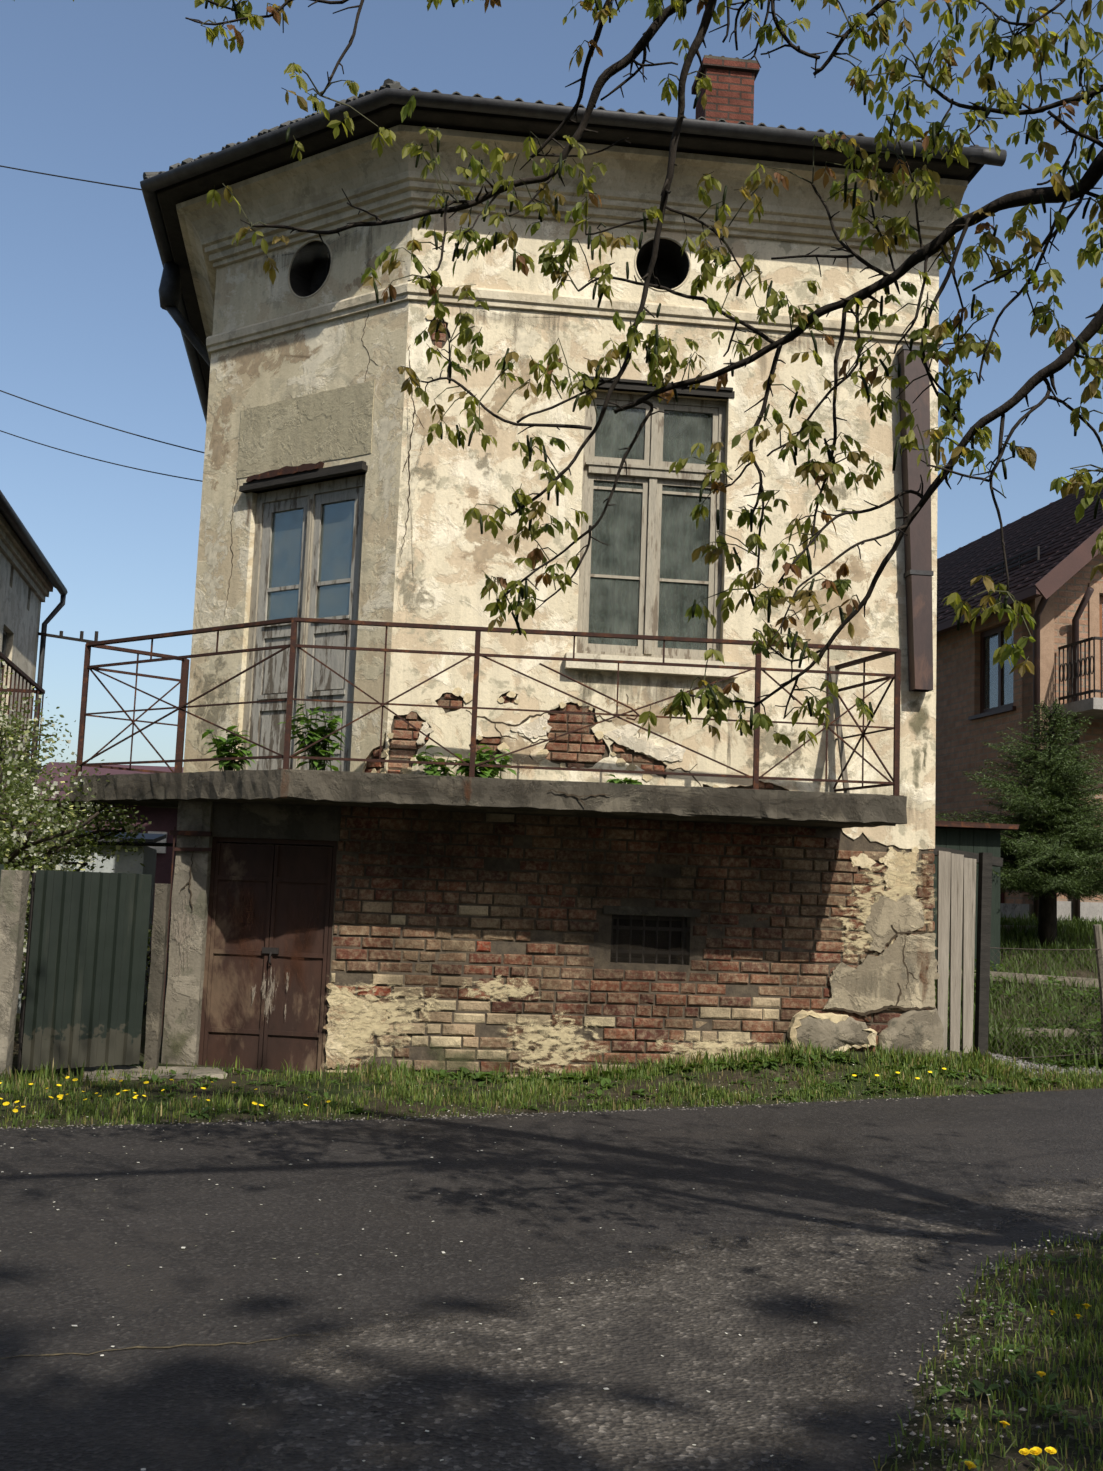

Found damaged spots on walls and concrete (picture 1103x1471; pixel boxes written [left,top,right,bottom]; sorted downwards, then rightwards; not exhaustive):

spalling [436,687,473,713]
spalling [365,711,434,774]
spalling [469,701,685,782]